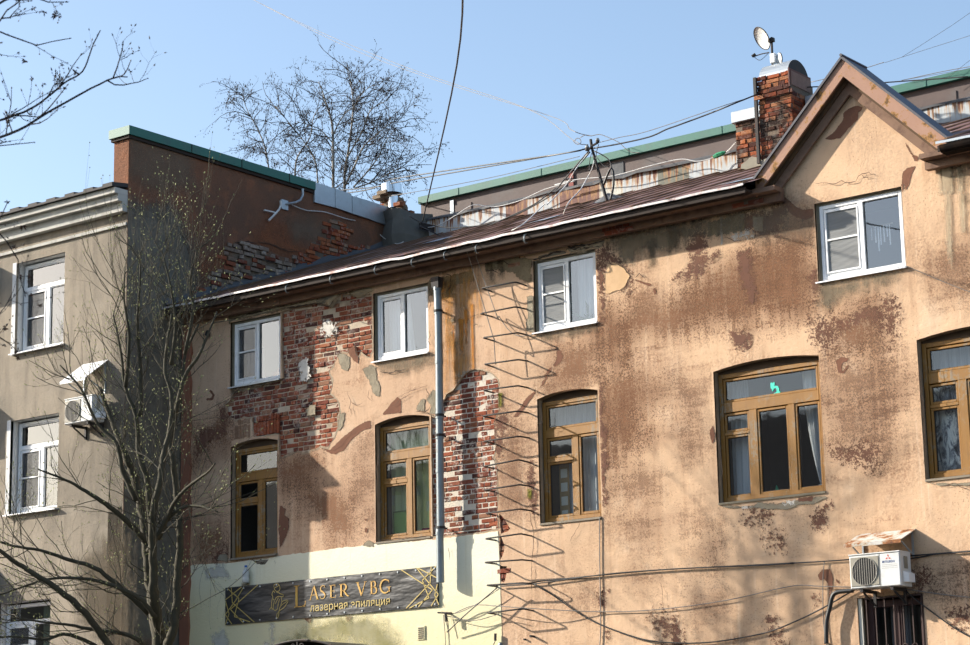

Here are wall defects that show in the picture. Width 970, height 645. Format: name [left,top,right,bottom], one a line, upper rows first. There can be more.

spalling [192,219,370,297]
water stain [612,211,744,265]
rust [441,266,481,384]
spalling [192,293,373,547]
peeling [430,197,906,582]